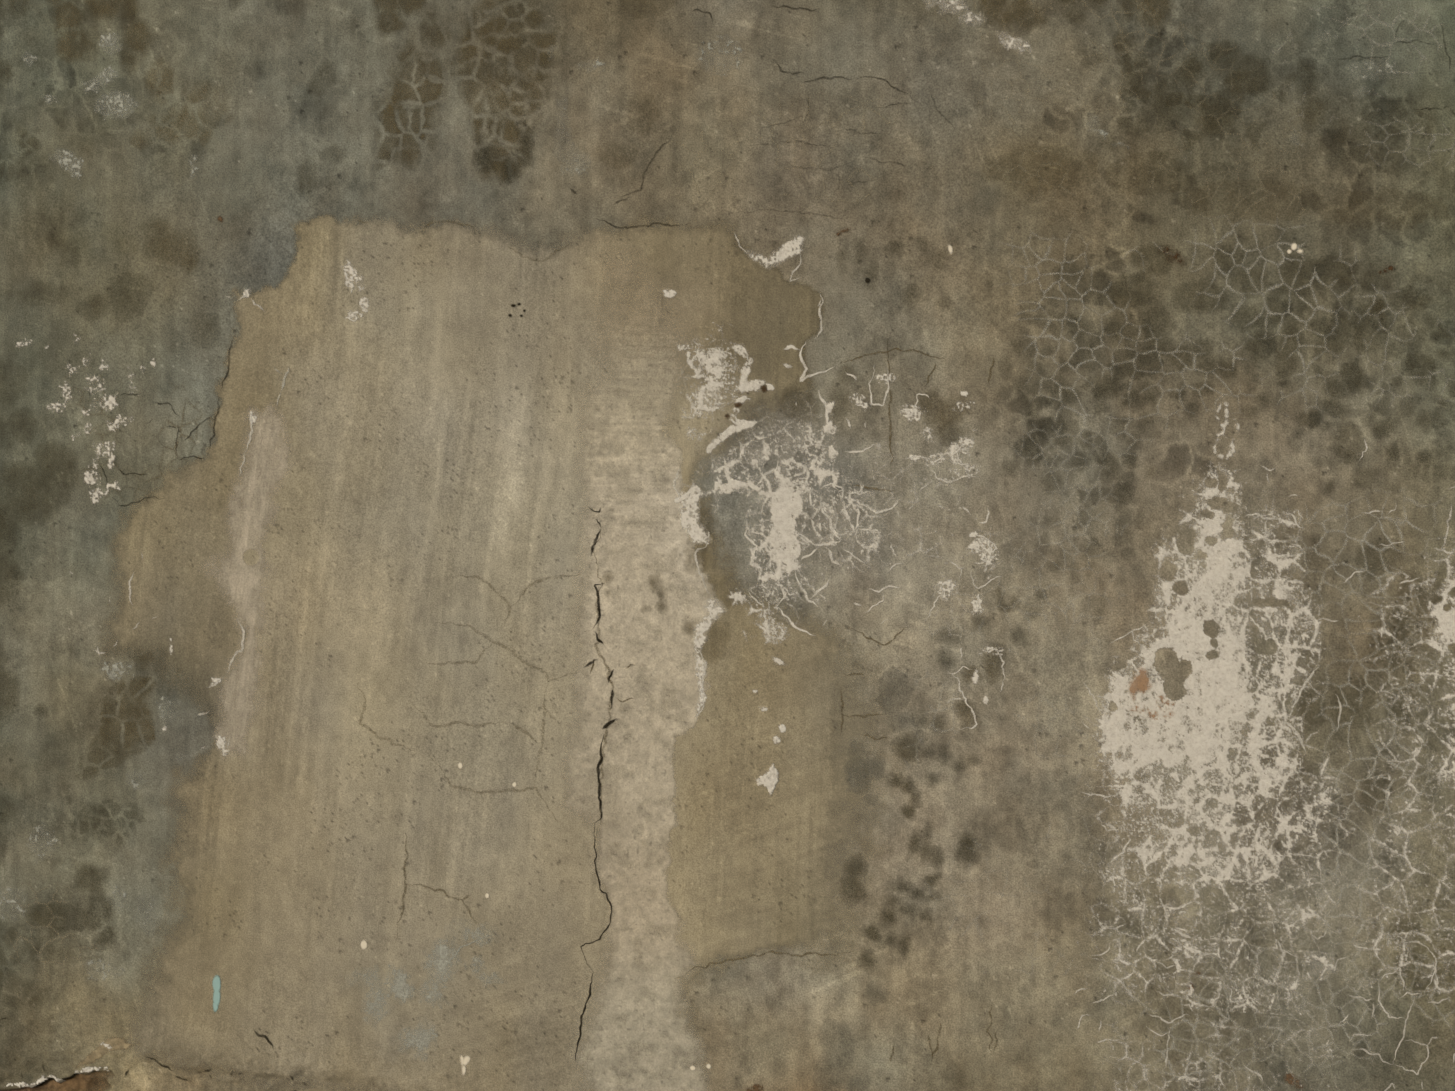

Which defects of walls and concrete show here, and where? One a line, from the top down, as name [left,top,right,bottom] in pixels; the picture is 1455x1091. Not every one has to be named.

water stain [458,0,554,179]
water stain [735,235,804,281]
crack [1210,240,1320,369]
water stain [673,295,999,716]
crack [1314,517,1419,620]
crack [575,508,634,1060]
flaking render [566,261,723,1091]
flaking render [757,764,779,794]
water stain [942,635,1015,730]
water stain [1076,403,1455,1091]
crack [1320,643,1417,936]
crack [1163,956,1386,1077]